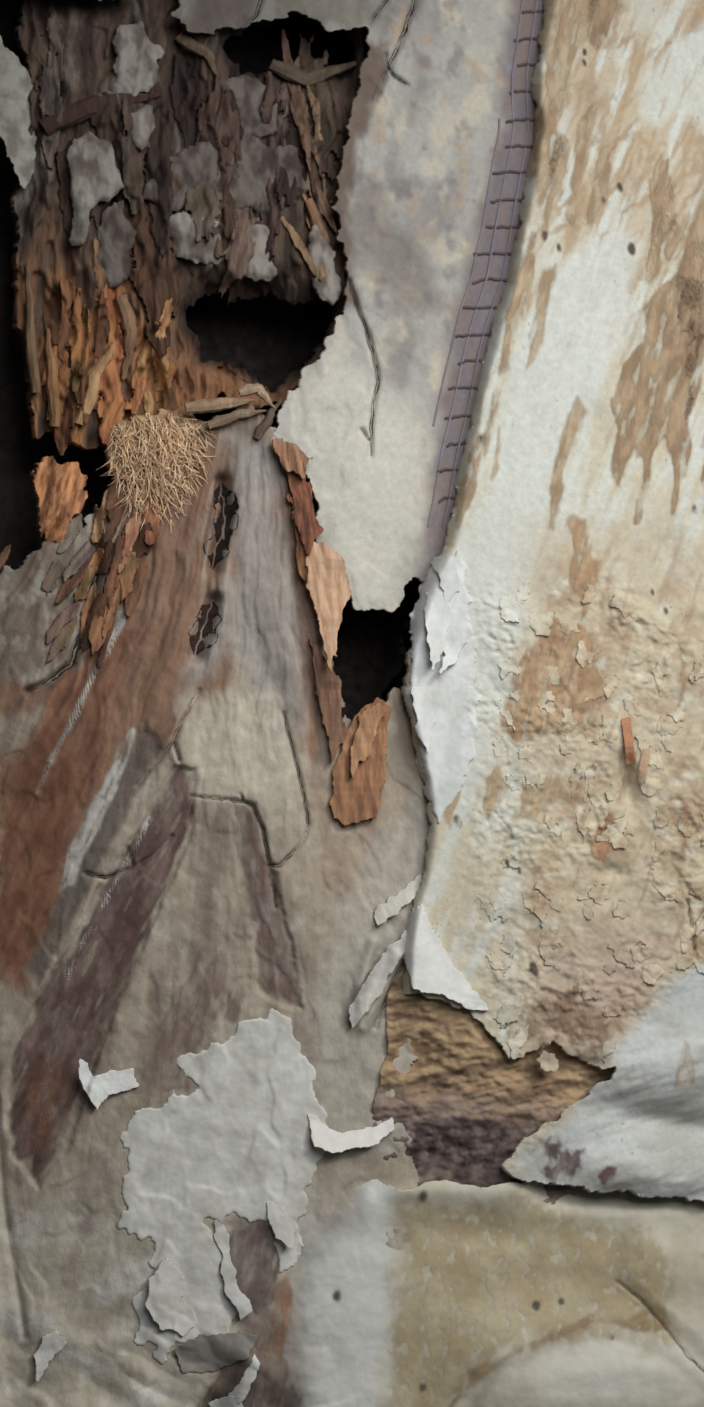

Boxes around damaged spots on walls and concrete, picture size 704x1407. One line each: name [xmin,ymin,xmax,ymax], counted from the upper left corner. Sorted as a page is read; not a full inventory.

peeling [96,20,165,151]
crack [371,0,415,99]
peeling [66,131,137,289]
peeling [142,74,309,283]
leakage [500,0,623,372]
leakage [628,156,682,281]
crack [349,282,380,454]
leakage [456,402,498,525]
leakage [550,398,586,527]
peeling [403,550,546,824]
crack [201,715,309,907]
peeling [117,809,633,1407]